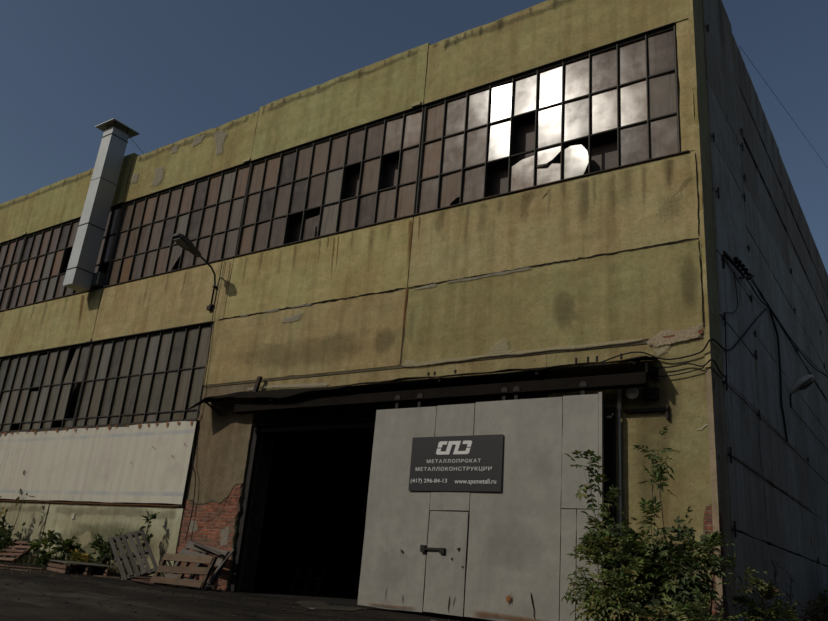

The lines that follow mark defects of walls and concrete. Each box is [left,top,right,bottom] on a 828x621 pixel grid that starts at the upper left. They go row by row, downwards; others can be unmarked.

spalling [403,323,703,366]
peeling [79,531,92,548]
peeling [175,483,243,591]